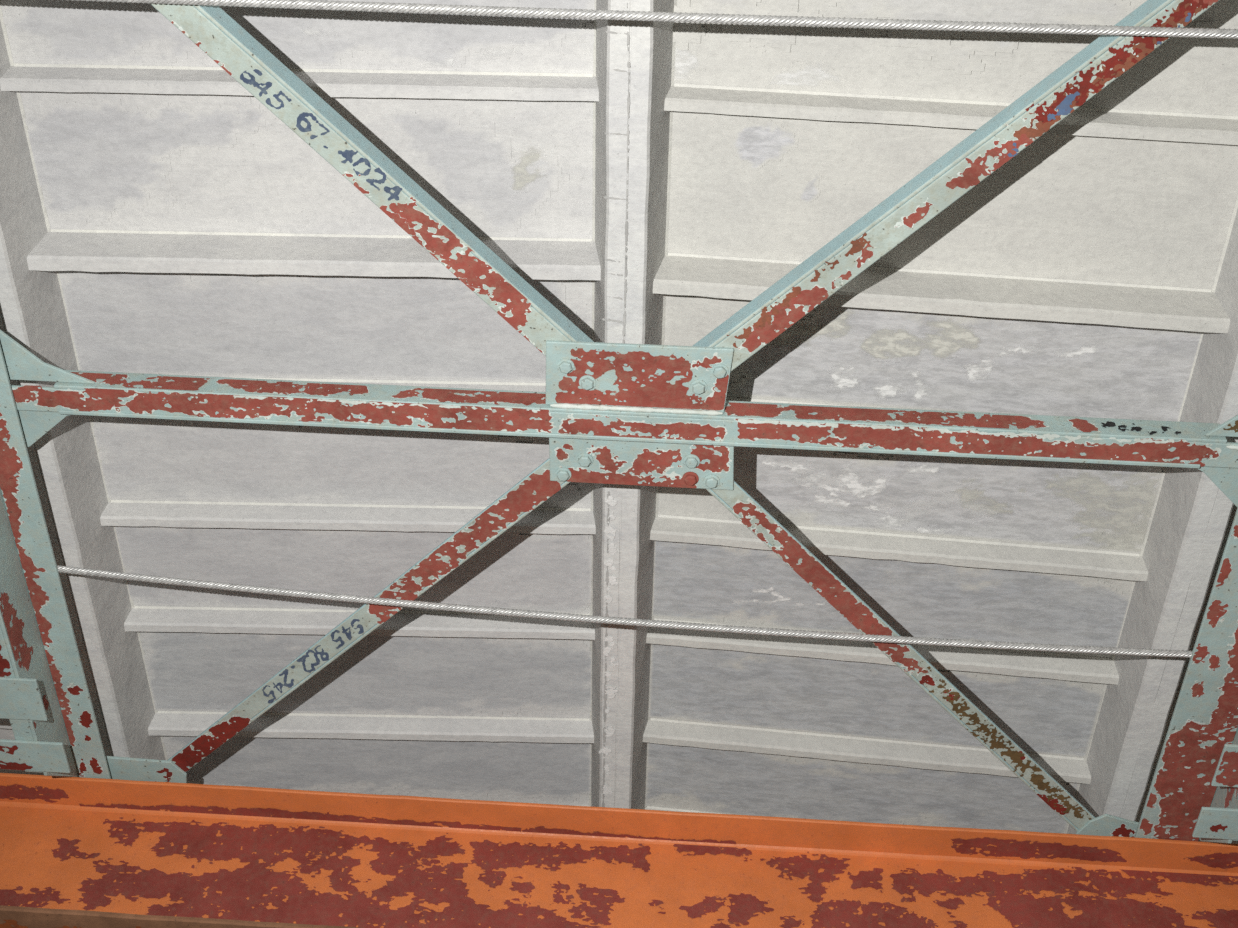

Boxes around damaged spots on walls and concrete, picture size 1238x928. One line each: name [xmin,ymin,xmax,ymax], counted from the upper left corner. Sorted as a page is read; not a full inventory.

peeling [946,0,1218,190]
peeling [343,171,545,355]
peeling [727,233,875,354]
peeling [894,197,934,228]
peeling [861,321,1031,381]
peeling [12,348,1222,624]
peeling [0,405,103,777]
peeling [732,498,960,702]
peeling [0,558,1238,928]
rust [922,661,1091,820]